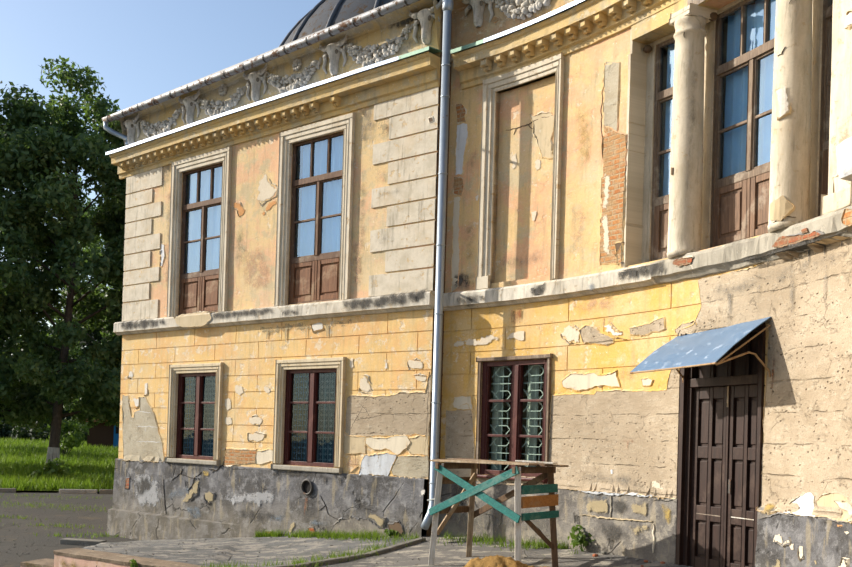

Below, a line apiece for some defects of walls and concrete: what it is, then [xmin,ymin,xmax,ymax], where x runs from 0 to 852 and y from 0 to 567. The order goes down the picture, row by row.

crack [510,115,552,134]
peeling [257,174,278,216]
flaking render [599,61,628,265]
peeling [769,195,795,221]
spalling [832,174,851,193]
flaking render [841,204,852,226]
flaking render [121,383,165,463]
crack [163,448,227,515]
flaking render [343,358,432,479]
flaking render [444,369,679,534]
flaking render [560,228,852,567]